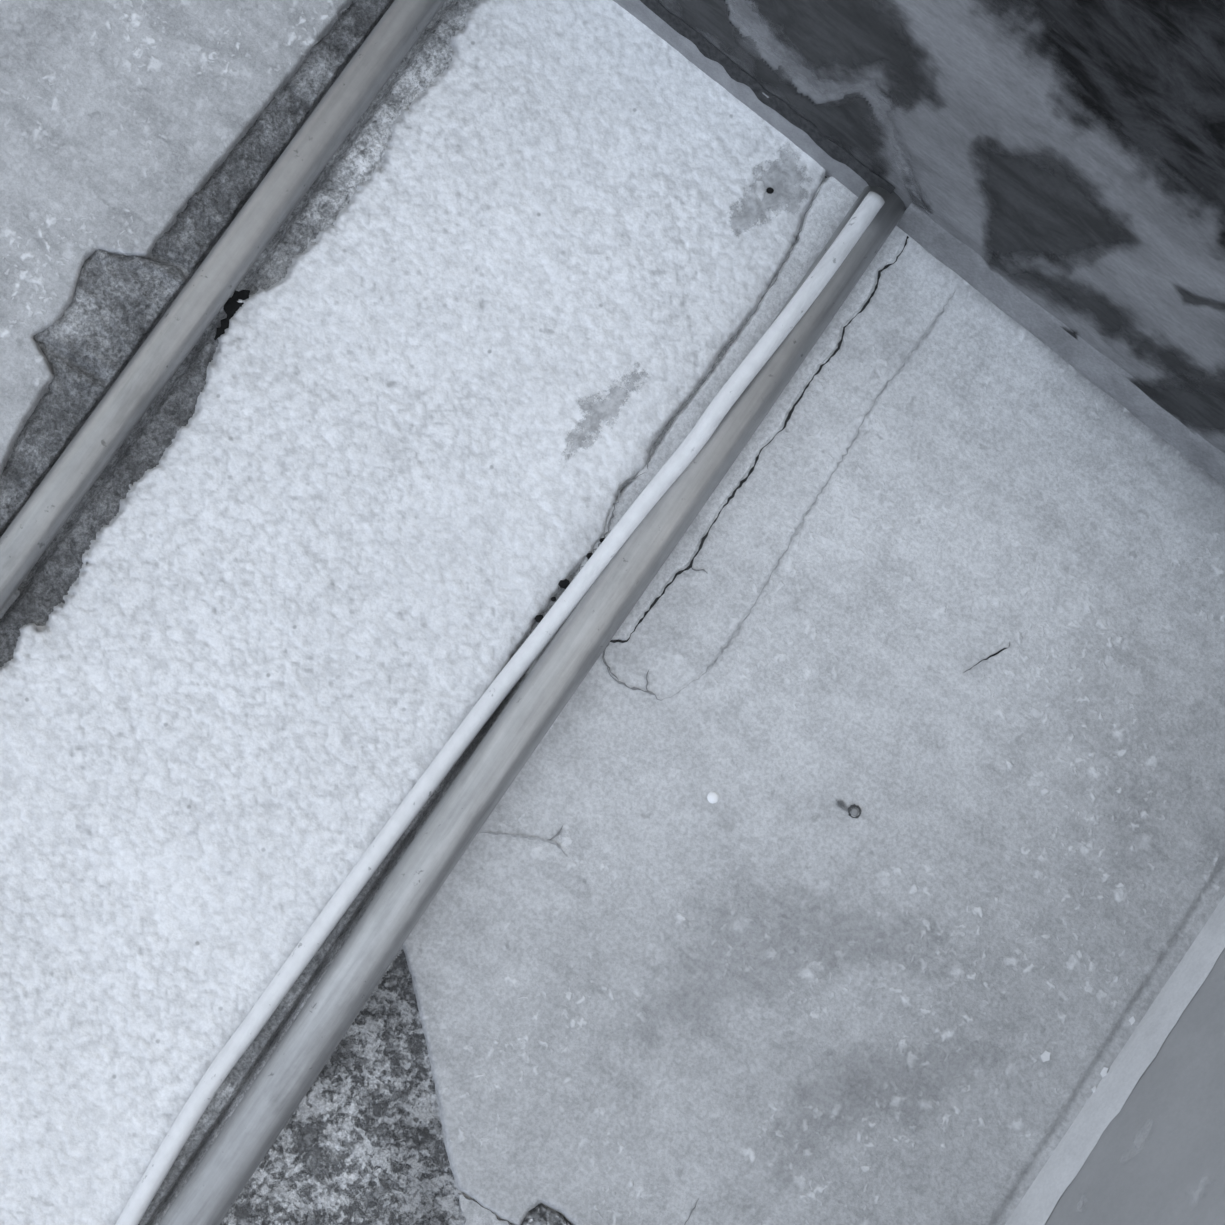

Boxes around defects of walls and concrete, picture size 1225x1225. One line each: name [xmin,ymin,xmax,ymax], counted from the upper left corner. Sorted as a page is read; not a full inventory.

leakage [656,0,938,212]
leakage [980,0,1225,248]
spalling [0,0,480,667]
crack [534,174,825,623]
crack [602,236,956,700]
leakage [974,139,1225,433]
spalling [220,950,573,1225]